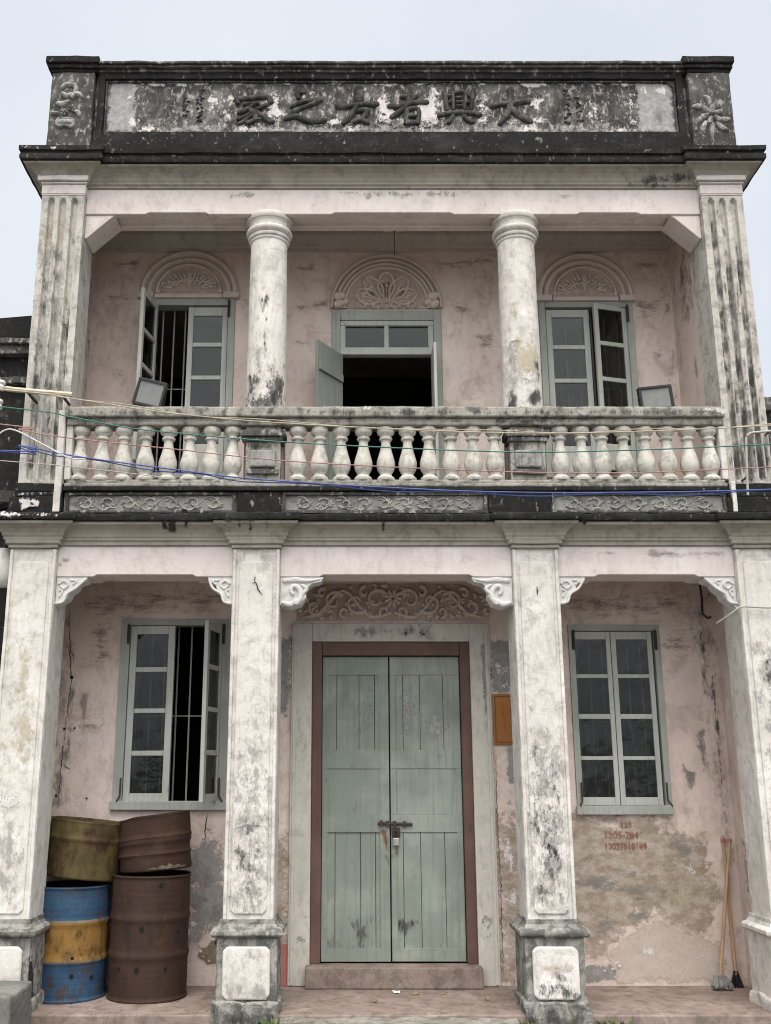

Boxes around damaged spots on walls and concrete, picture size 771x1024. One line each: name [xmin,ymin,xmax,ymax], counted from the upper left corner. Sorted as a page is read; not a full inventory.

peeling [107,83,676,132]
damp [21,206,137,482]
peeling [508,331,541,407]
damp [611,224,770,482]
damp [0,632,36,762]
crack [58,611,74,797]
peeling [481,640,510,714]
damp [699,670,720,761]
damp [0,791,29,908]
peeling [483,729,722,985]
spalling [197,938,217,964]